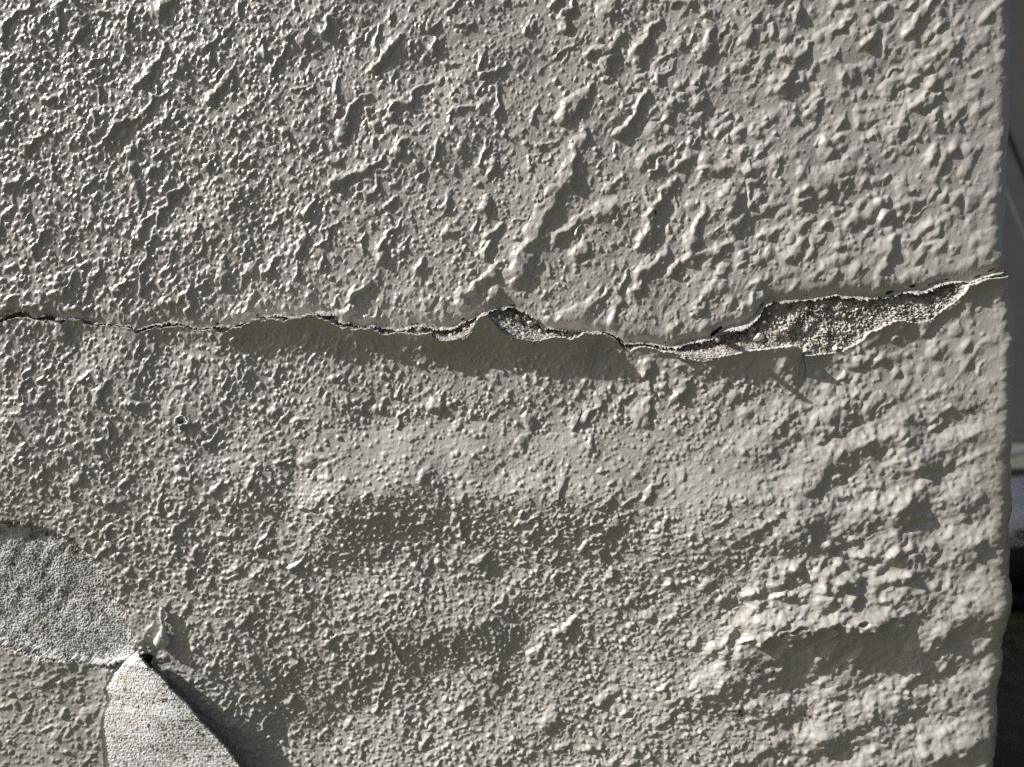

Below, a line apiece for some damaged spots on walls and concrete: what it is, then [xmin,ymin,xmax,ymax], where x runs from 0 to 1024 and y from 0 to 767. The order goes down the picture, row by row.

crack [0,252,1015,423]
peeling [0,521,240,767]